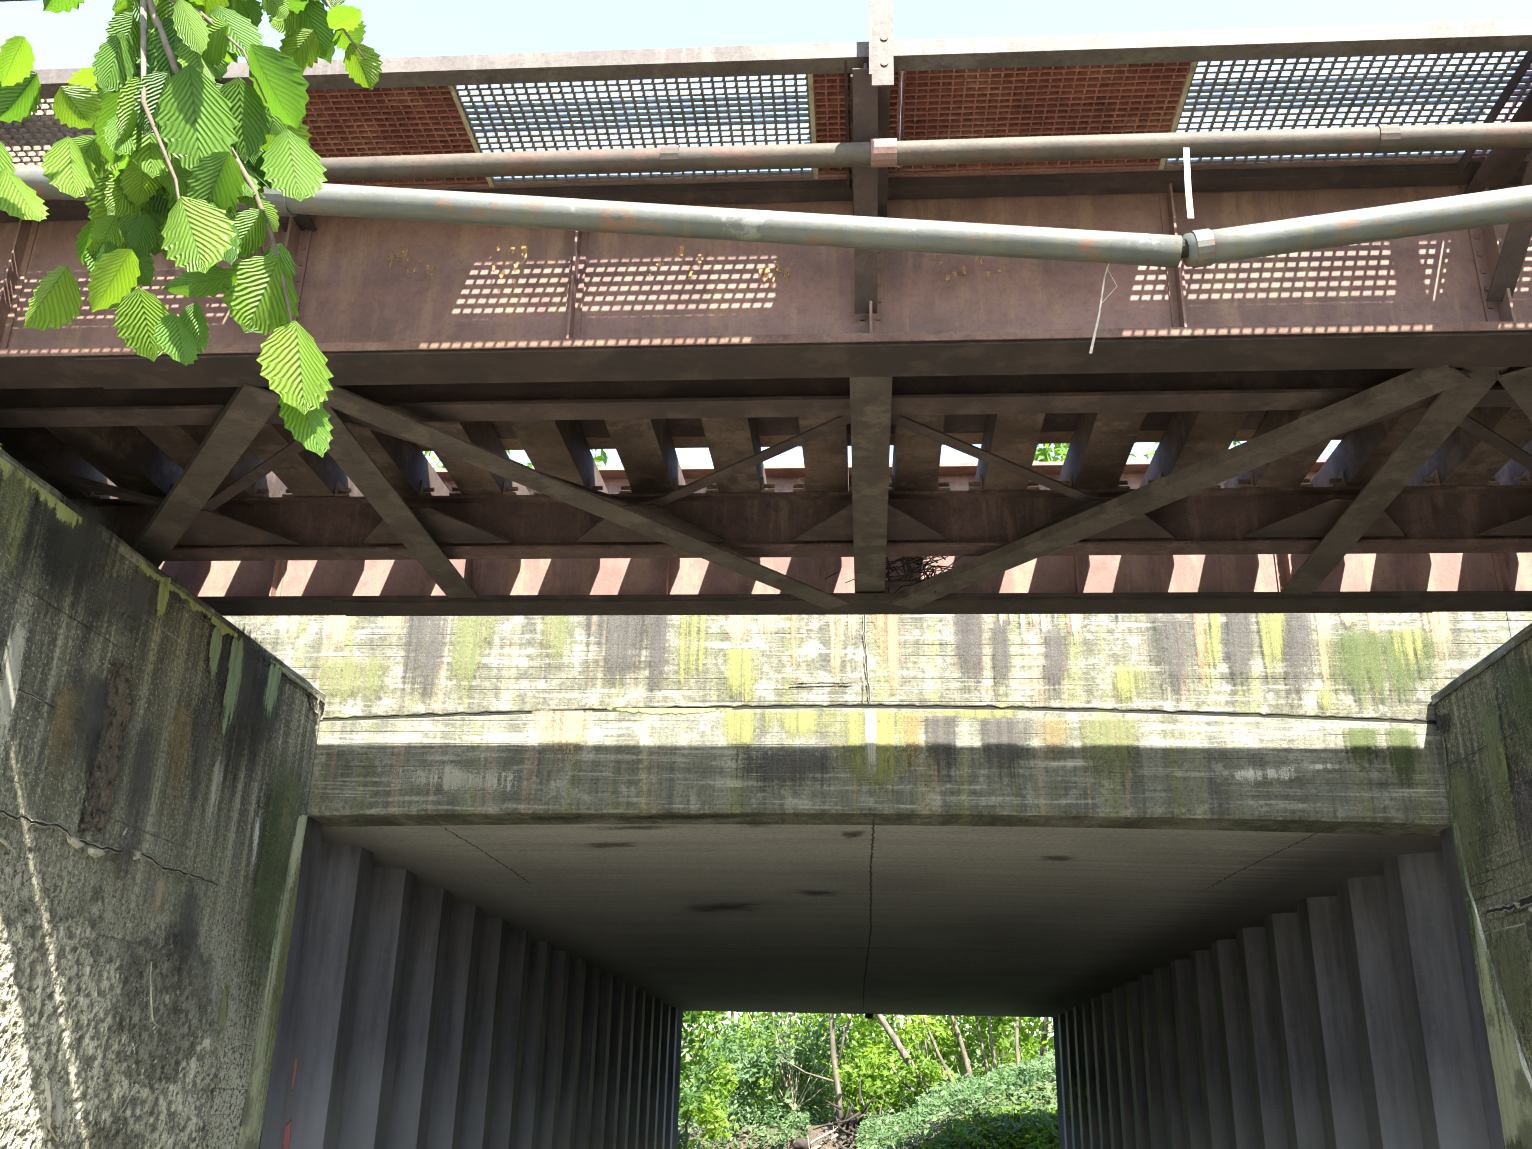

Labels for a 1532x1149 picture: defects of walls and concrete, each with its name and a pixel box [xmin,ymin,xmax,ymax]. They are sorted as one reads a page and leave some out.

rust [490,243,528,278]
rust [649,246,711,281]
water stain [403,616,496,693]
water stain [541,615,706,686]
rust [727,615,797,667]
rust [829,615,901,692]
water stain [953,614,1075,689]
water stain [724,649,956,789]
water stain [981,718,1030,779]
crack [0,808,217,885]
water stain [193,624,302,1060]
crack [1471,879,1532,917]